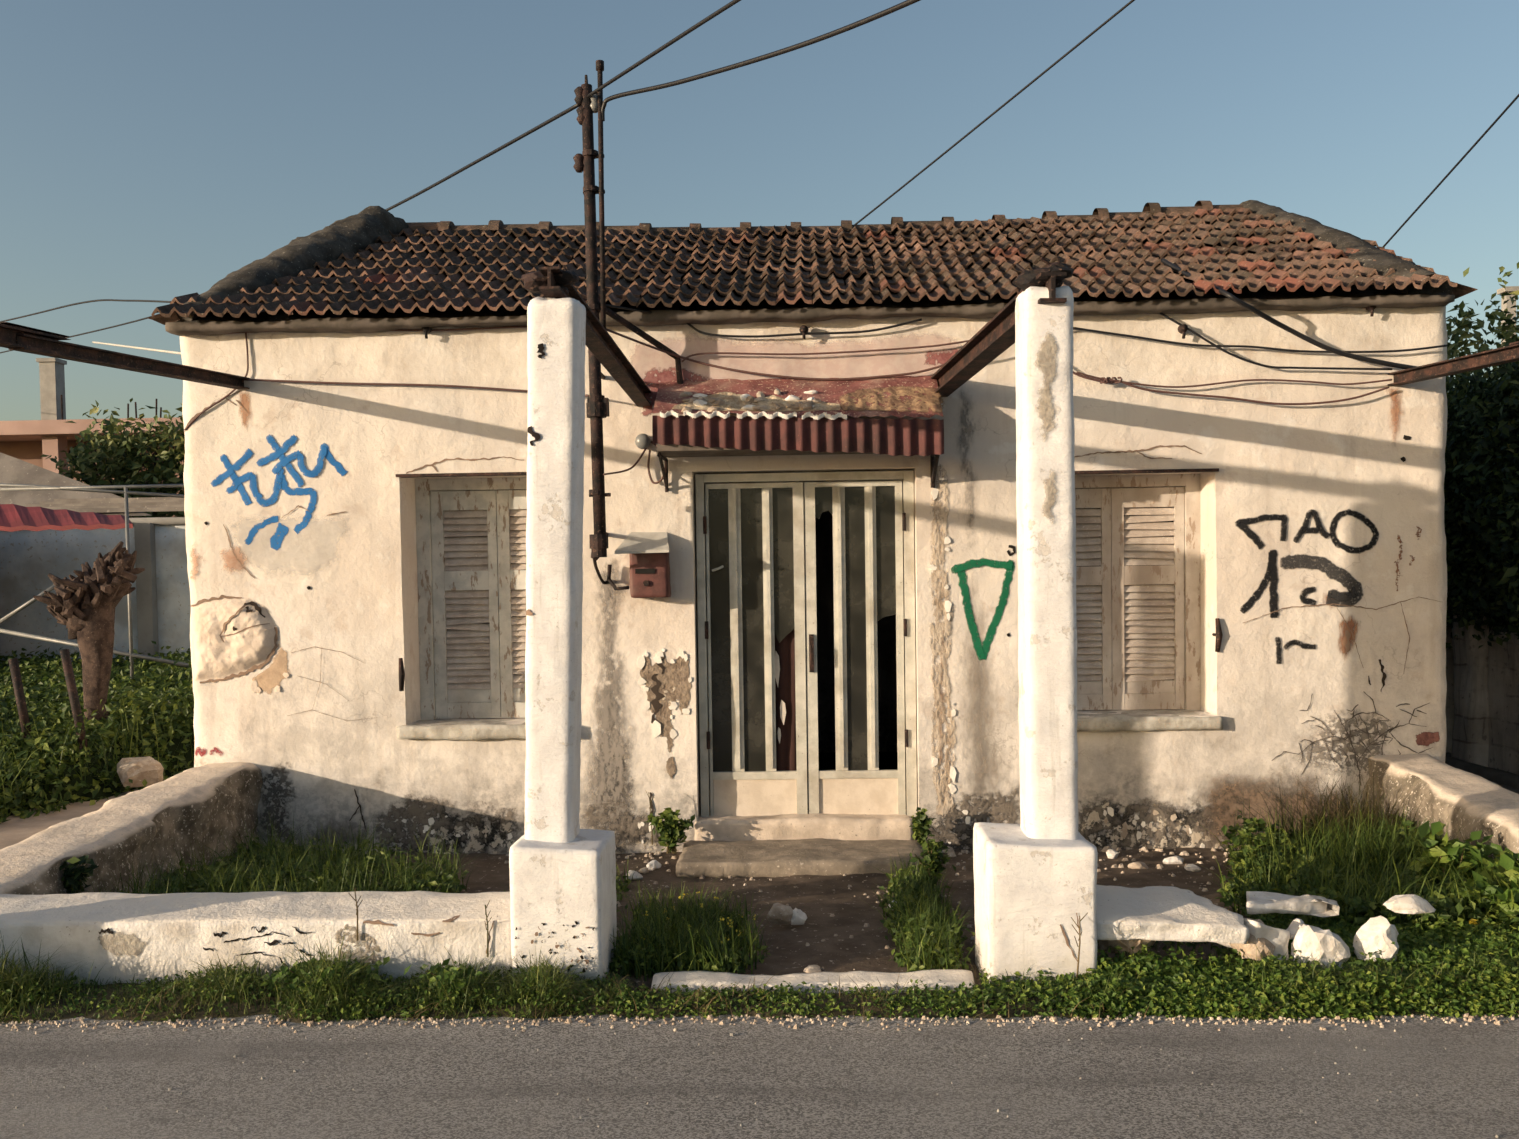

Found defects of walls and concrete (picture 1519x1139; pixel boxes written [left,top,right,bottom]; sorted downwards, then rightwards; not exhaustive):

peeling [631,334,961,420]
peeling [1035,334,1058,440]
crack [406,457,520,474]
crack [1074,445,1202,459]
peeling [928,466,957,816]
corrosion [1339,618,1358,655]
crack [288,647,369,721]
damp [585,561,679,854]
flaking render [638,648,692,779]
damp [260,766,295,843]
damp [376,796,516,854]
flaking render [98,928,144,956]